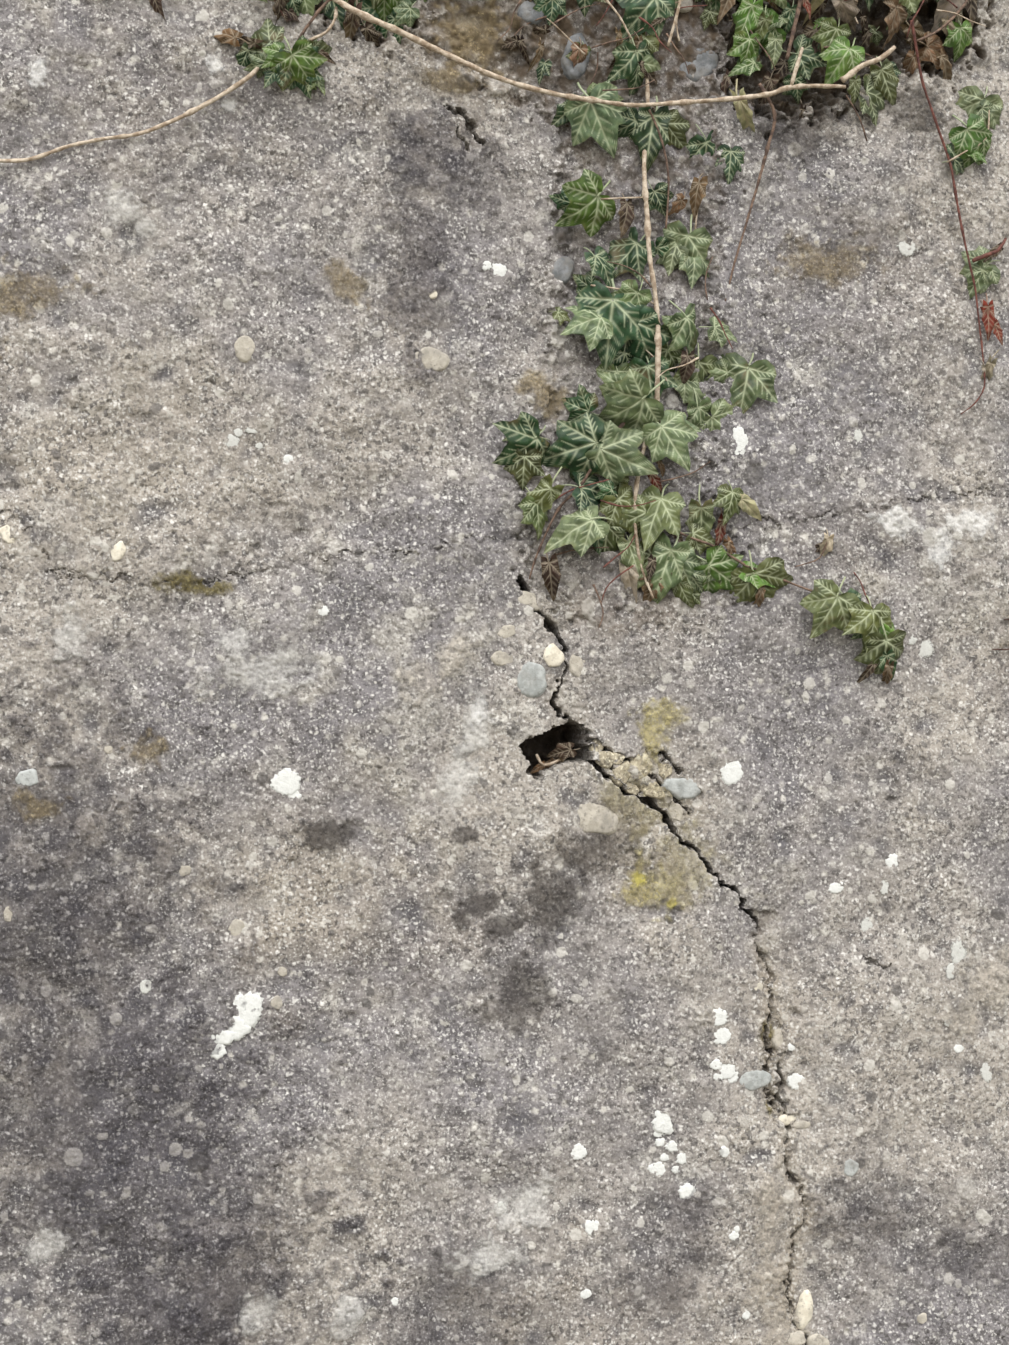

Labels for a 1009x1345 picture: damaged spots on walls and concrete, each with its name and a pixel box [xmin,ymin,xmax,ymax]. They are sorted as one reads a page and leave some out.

crack [0,509,273,589]
crack [317,530,536,563]
crack [516,572,808,1345]